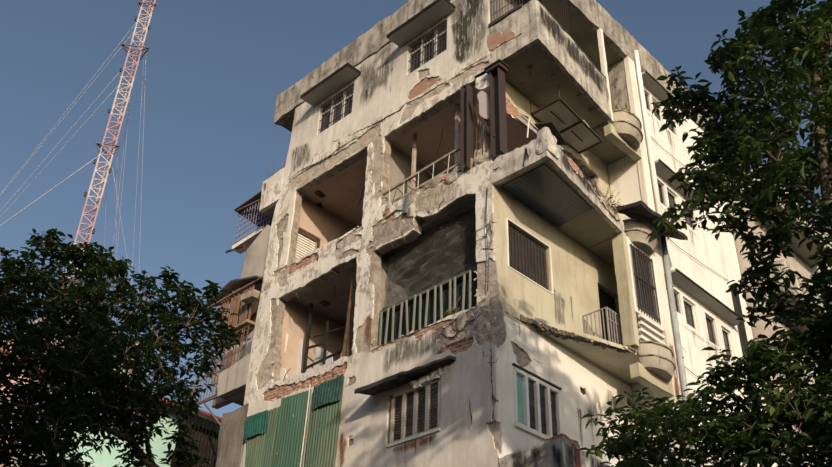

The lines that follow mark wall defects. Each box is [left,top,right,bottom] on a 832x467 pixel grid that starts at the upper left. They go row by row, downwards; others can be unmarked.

damp [452,0,486,61]
flaking render [399,61,489,124]
flaking render [289,125,384,199]
flaking render [271,214,318,287]
flaking render [335,182,417,284]
flaking render [256,298,356,402]
flaking render [352,258,531,369]
crack [439,313,483,342]
crack [482,336,498,393]
spalling [520,314,636,355]
damp [512,447,539,467]
damp [552,445,574,467]